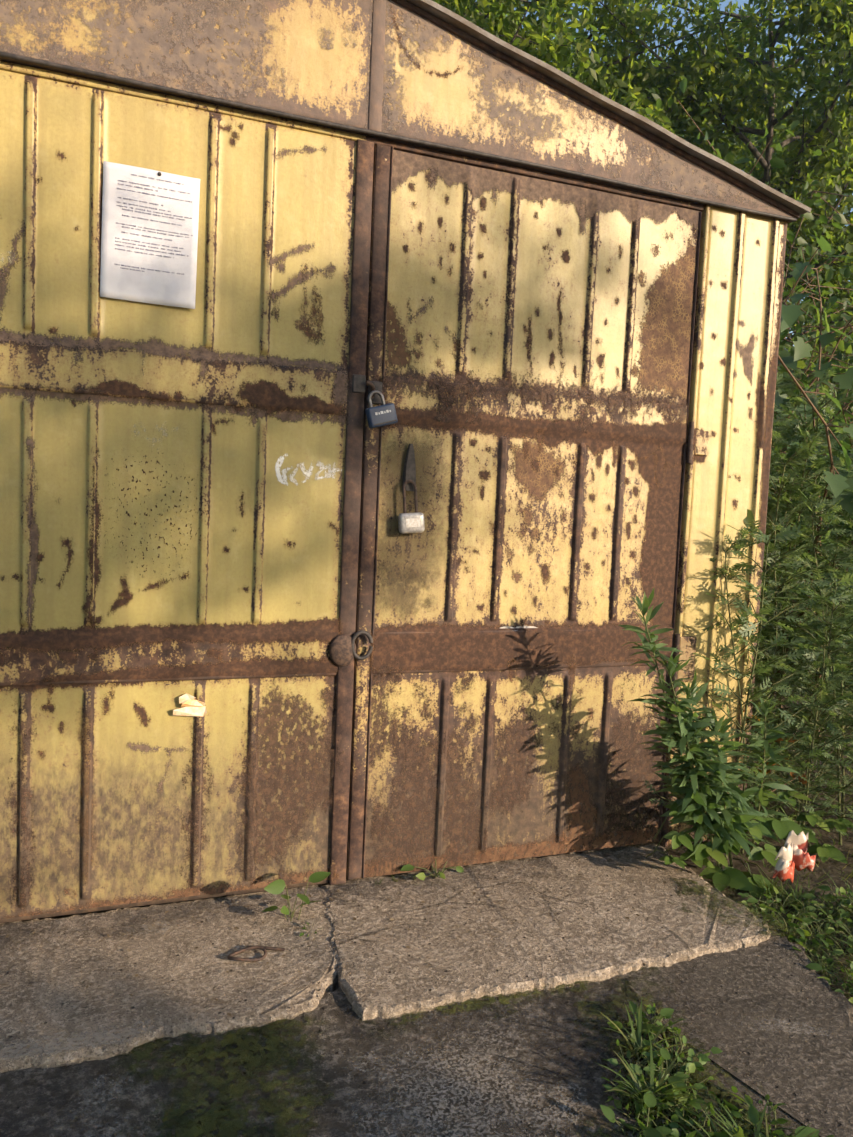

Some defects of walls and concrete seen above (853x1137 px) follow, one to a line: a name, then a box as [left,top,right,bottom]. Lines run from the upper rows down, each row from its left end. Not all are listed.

rust [0,327,349,427]
rust [295,264,325,344]
rust [355,150,716,879]
rust [631,142,769,211]
rust [747,268,784,549]
rust [0,437,344,918]